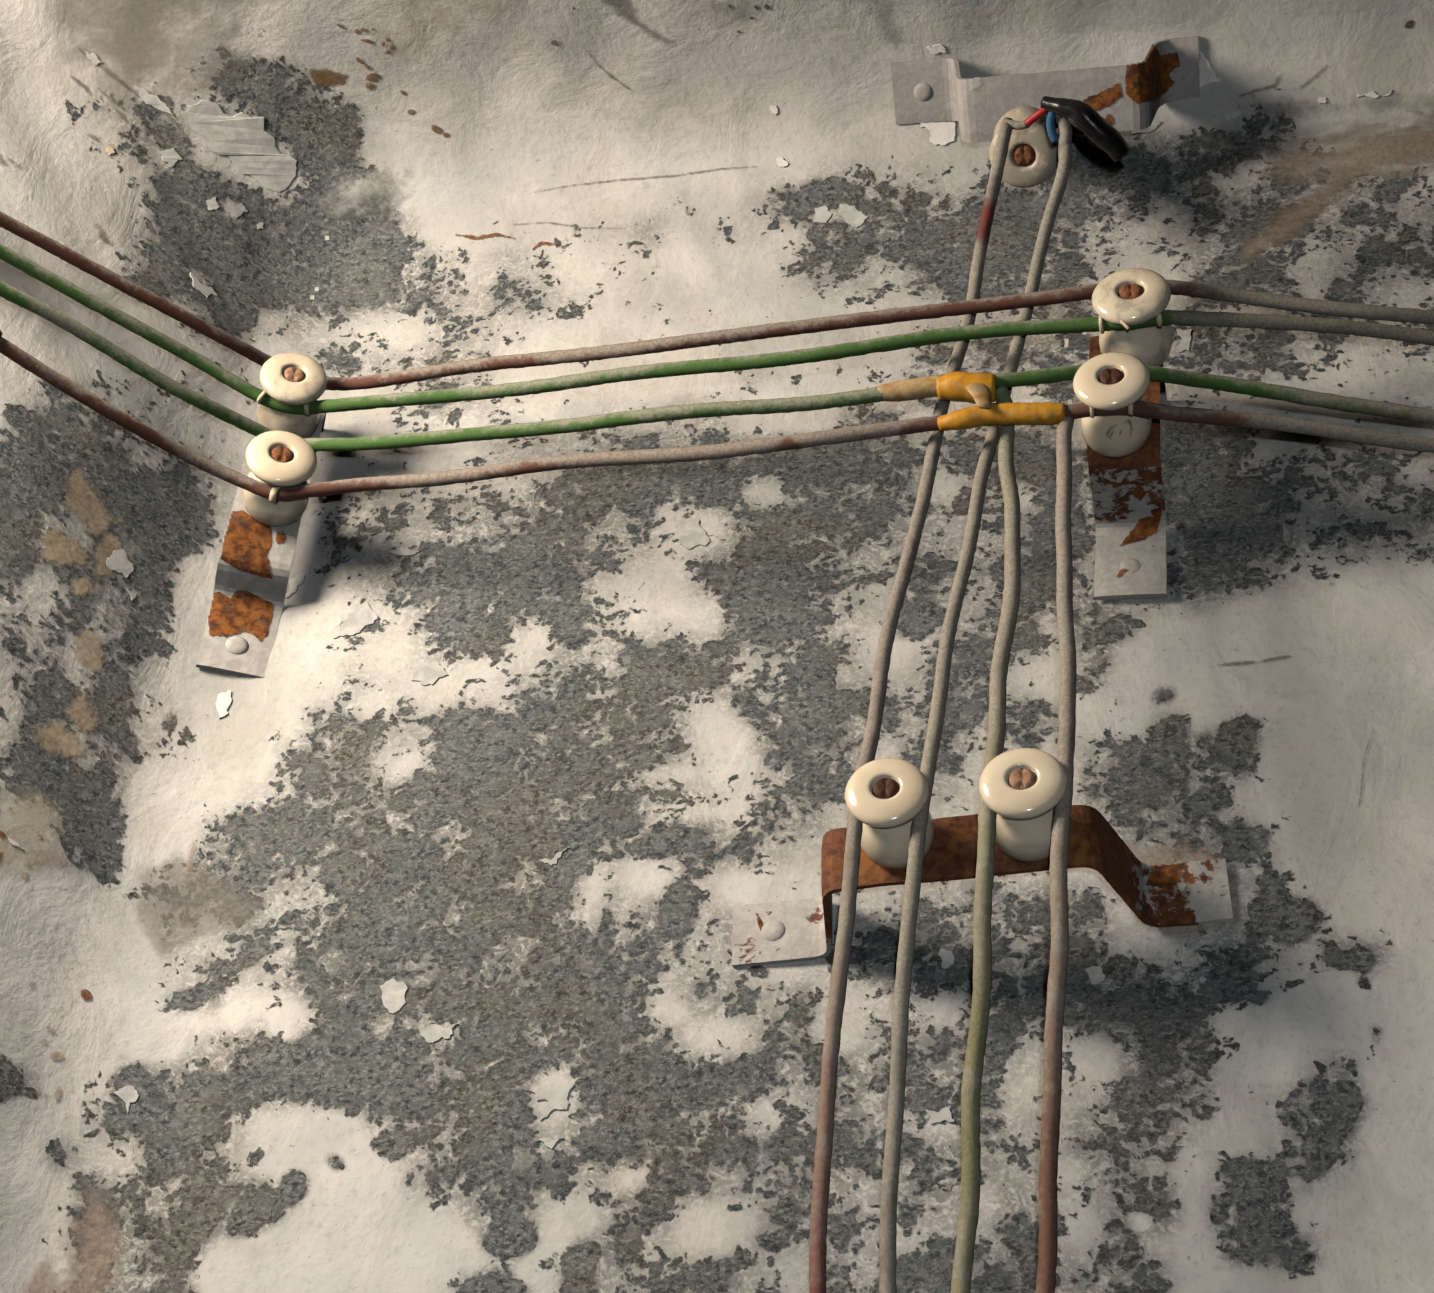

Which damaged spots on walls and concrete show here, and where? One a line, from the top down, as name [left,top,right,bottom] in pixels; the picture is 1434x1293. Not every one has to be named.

damp [62,0,196,82]
rust [1084,45,1180,125]
peeling [920,121,955,146]
peeling [65,47,390,361]
damp [752,88,1434,387]
rust [221,510,286,579]
rust [1120,484,1162,546]
damp [1071,390,1434,700]
rust [208,590,273,641]
peeling [285,573,305,599]
peeling [216,690,232,719]
damp [0,188,1090,1293]